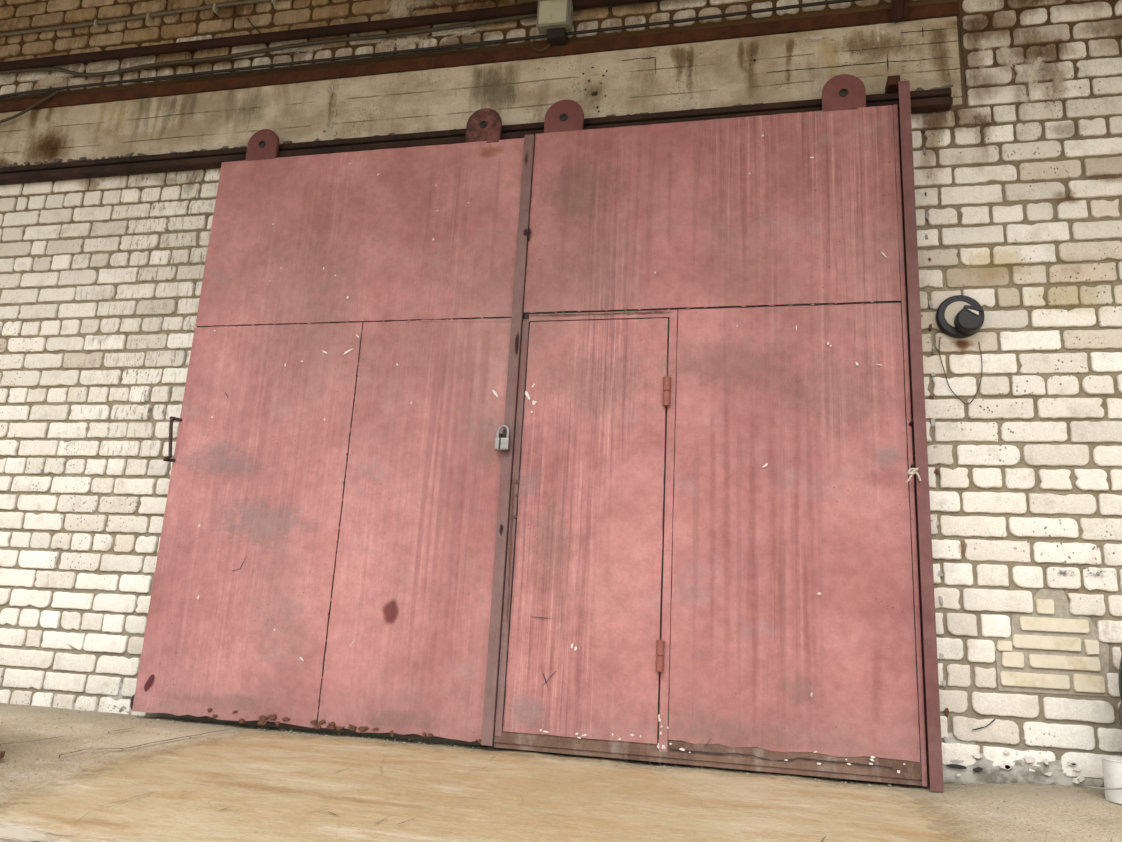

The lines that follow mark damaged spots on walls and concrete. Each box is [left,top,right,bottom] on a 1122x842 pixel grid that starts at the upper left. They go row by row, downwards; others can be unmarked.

rust [232,710,290,726]
rust [310,720,394,737]